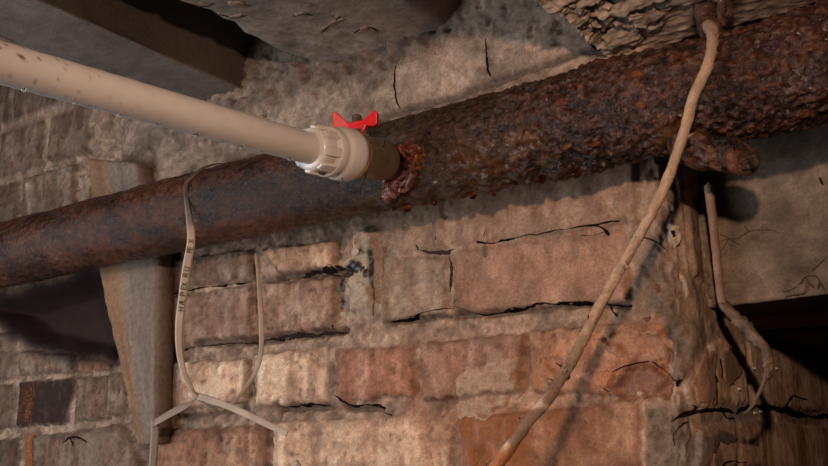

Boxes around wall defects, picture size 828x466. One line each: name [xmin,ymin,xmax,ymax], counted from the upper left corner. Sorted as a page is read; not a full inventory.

spalling [542,0,666,58]
rust [382,141,426,203]
rust [436,131,544,186]
crack [476,220,619,244]
crack [297,264,352,278]
crack [392,245,632,323]
spalling [705,263,729,308]
crack [603,361,683,392]
crack [670,359,828,446]